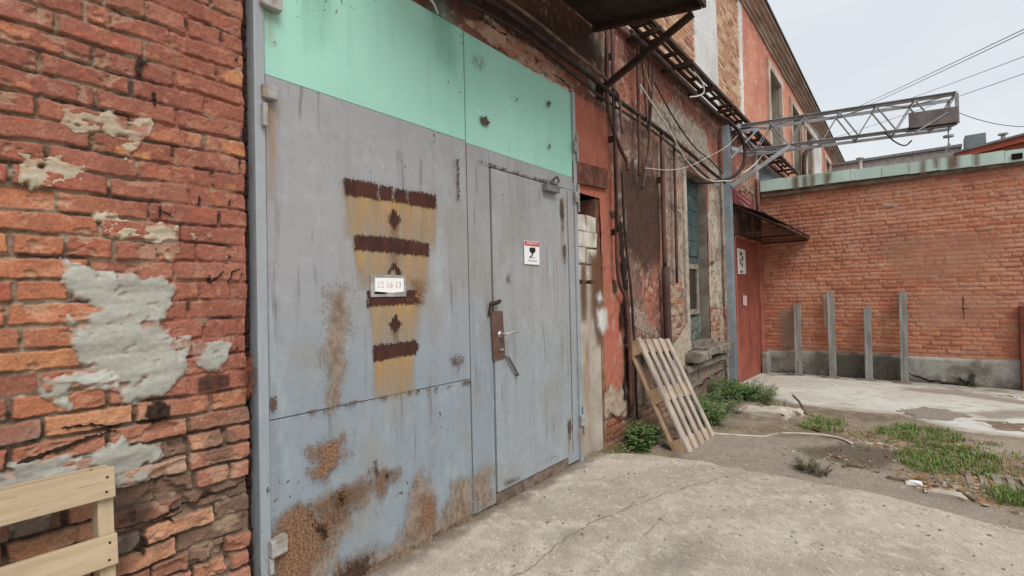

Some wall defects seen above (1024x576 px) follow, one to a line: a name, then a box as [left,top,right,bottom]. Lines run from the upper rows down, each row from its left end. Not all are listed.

spalling [59,107,154,161]
spalling [12,153,89,192]
spalling [627,264,684,342]
peeling [52,368,121,385]
peeling [191,339,233,391]
corrosion [319,286,351,413]
peeling [604,383,628,439]
corrosion [271,430,496,576]
crack [512,472,745,576]